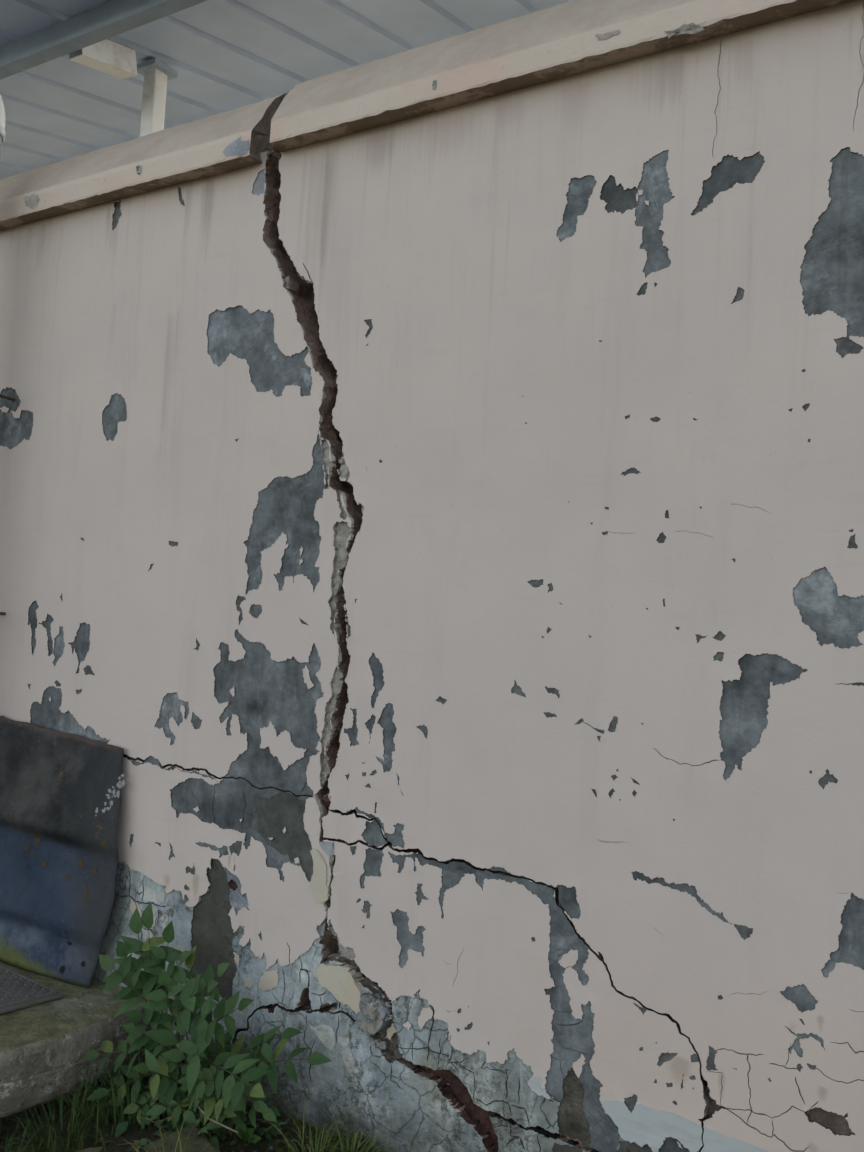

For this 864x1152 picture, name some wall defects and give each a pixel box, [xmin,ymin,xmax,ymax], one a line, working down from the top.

peeling [556,150,675,296]
peeling [691,151,765,216]
peeling [800,147,864,358]
peeling [206,305,313,397]
peeling [28,600,95,675]
peeling [130,428,335,915]
peeling [344,653,404,796]
crack [120,151,864,1152]
peeling [718,653,808,781]
peeling [793,566,864,649]
peeling [345,803,620,1152]
peeling [821,893,864,978]